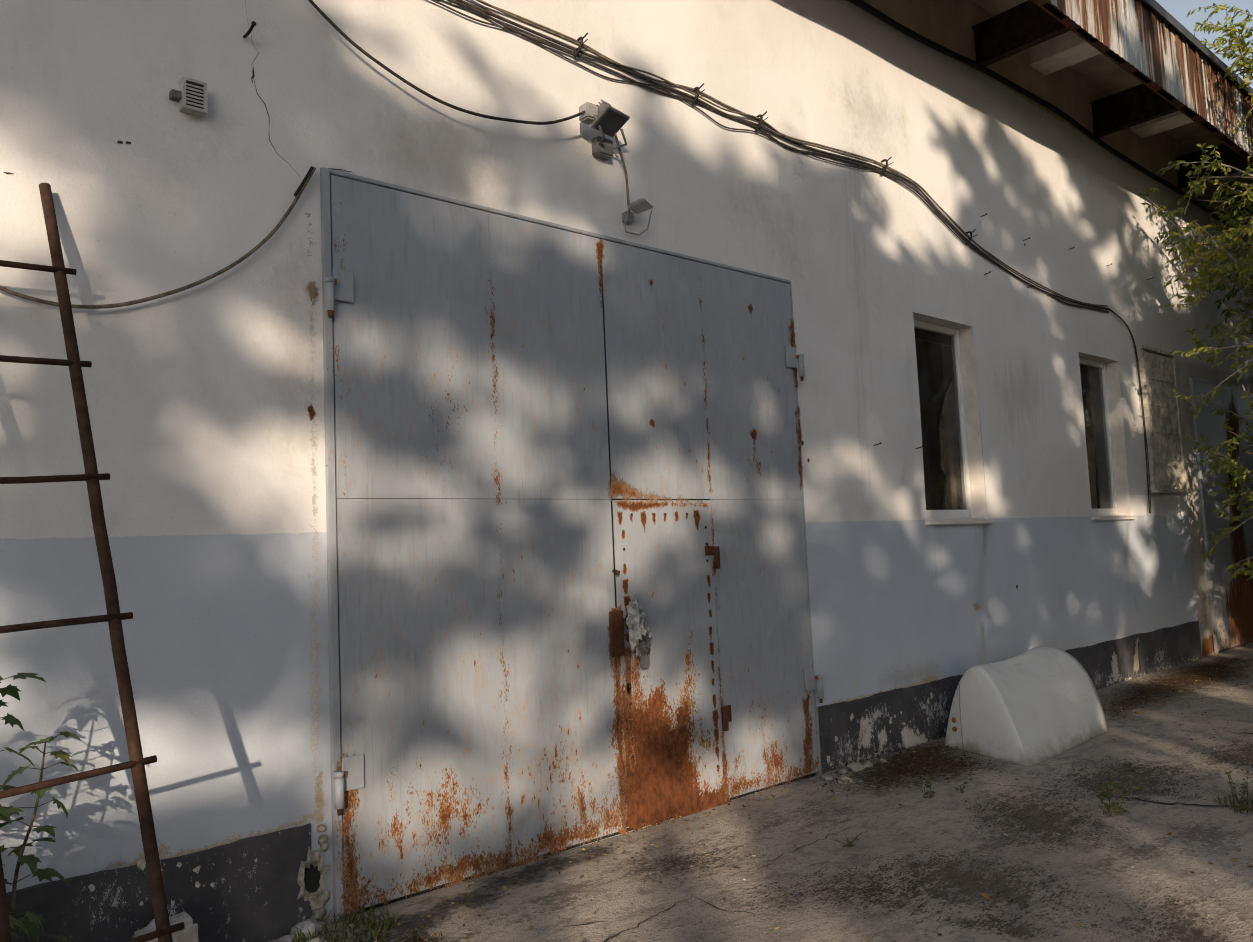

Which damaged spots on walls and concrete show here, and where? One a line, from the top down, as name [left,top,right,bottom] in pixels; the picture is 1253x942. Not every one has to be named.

corrosion [1085,0,1238,141]
corrosion [595,239,604,307]
peeling [63,286,330,940]
corrosion [333,280,822,920]
peeling [816,674,952,769]
peeling [1092,636,1195,687]